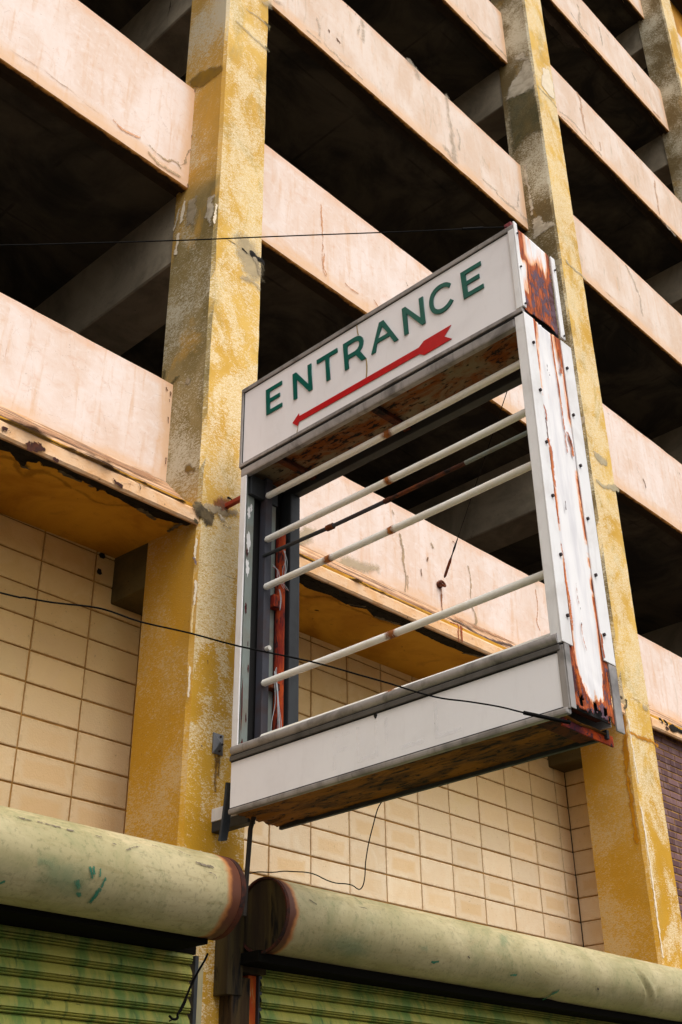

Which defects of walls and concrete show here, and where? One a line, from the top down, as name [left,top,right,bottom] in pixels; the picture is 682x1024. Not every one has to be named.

leakage [508,89,541,150]
peeling [173,194,218,255]
leakage [237,235,260,290]
rust [547,338,574,457]
leakage [0,413,186,503]
peeling [0,439,238,532]
rust [543,404,566,524]
crack [399,533,408,592]
rust [561,544,586,648]
rust [572,666,582,694]